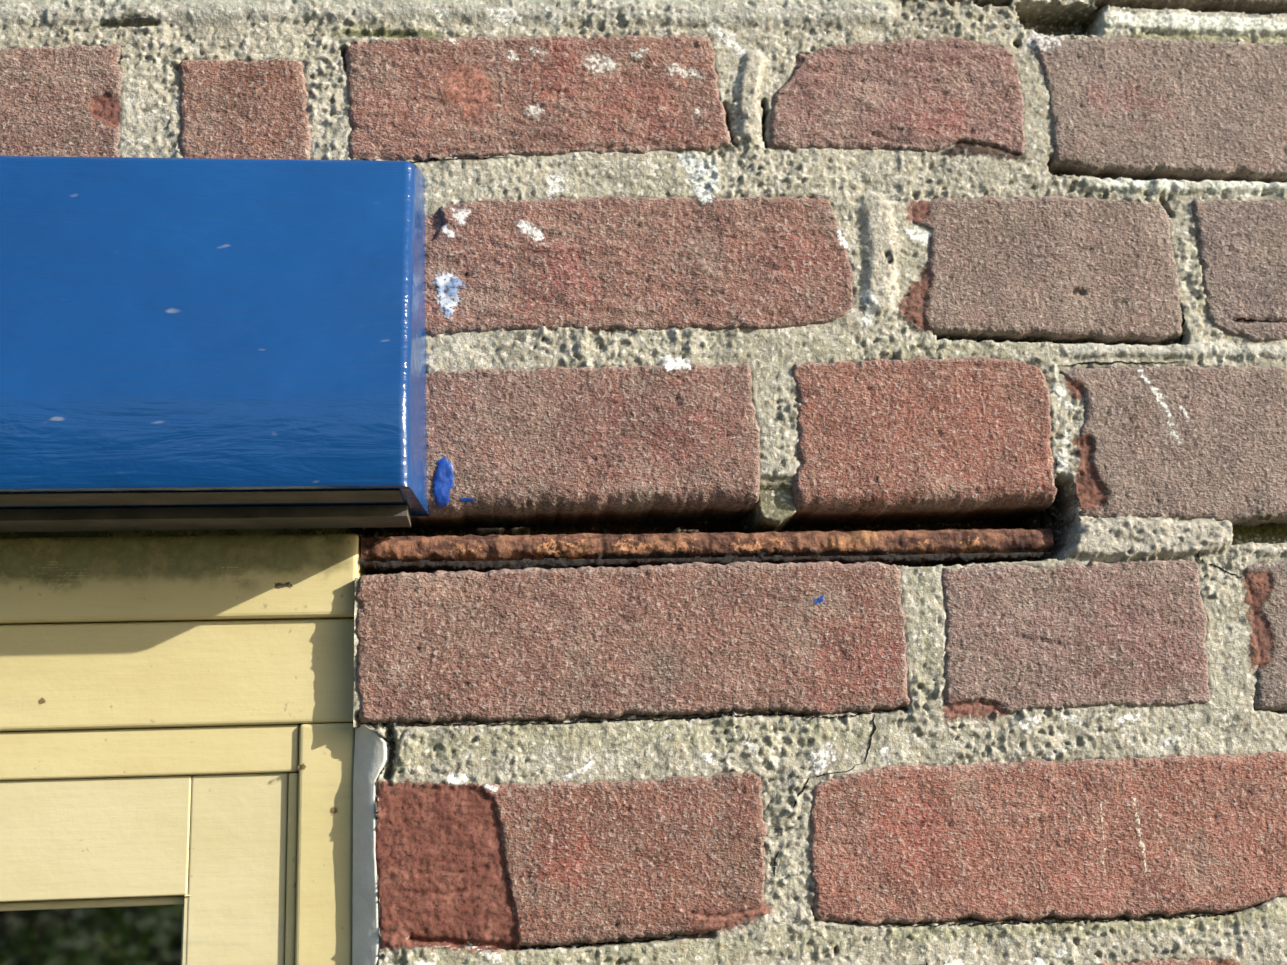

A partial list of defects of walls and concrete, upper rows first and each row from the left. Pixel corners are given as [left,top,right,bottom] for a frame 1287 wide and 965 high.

crack [724,100,765,144]
spalling [905,199,932,225]
spalling [898,263,935,332]
crack [1225,310,1287,322]
corrosion [449,499,1019,560]
spalling [1241,571,1277,670]
crack [376,710,896,808]